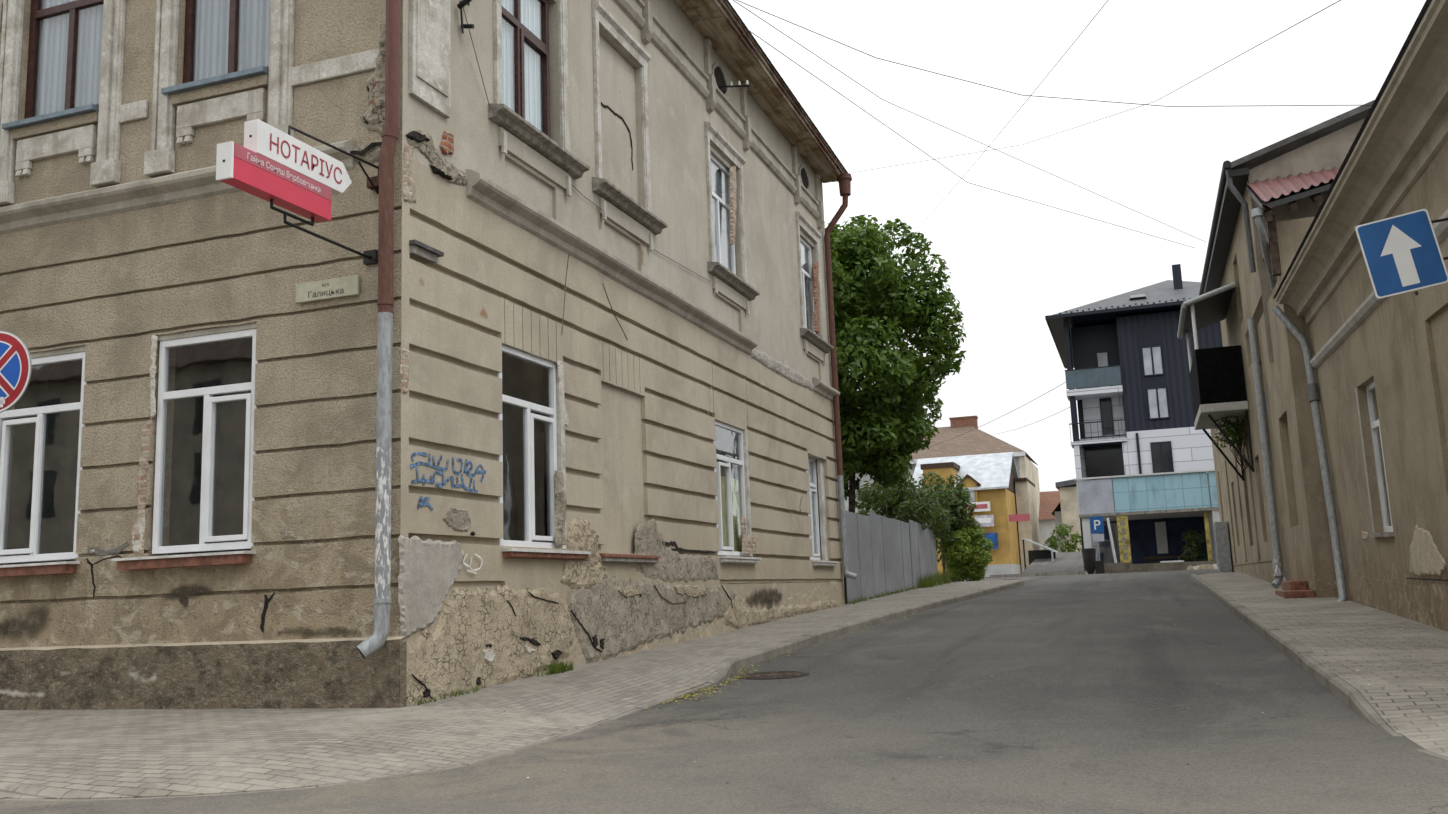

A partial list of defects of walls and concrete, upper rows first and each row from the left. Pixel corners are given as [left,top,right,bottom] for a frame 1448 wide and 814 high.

flaking render [360,23,386,135]
flaking render [403,130,468,203]
flaking render [130,335,158,555]
flaking render [557,361,569,427]
flaking render [554,470,568,547]
flaking render [399,515,839,706]